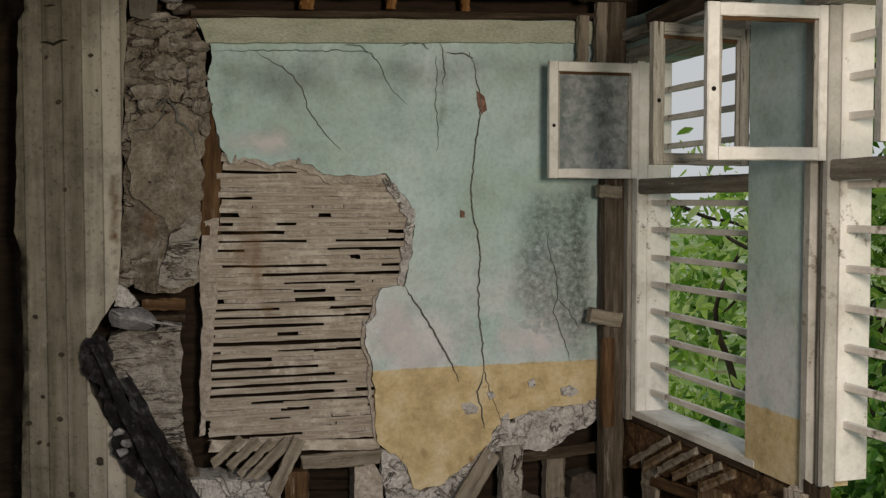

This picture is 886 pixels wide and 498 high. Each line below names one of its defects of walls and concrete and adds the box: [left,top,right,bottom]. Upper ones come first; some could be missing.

peeling [114,283,140,308]
crack [214,44,408,147]
spalling [203,152,597,498]
crack [402,43,501,429]